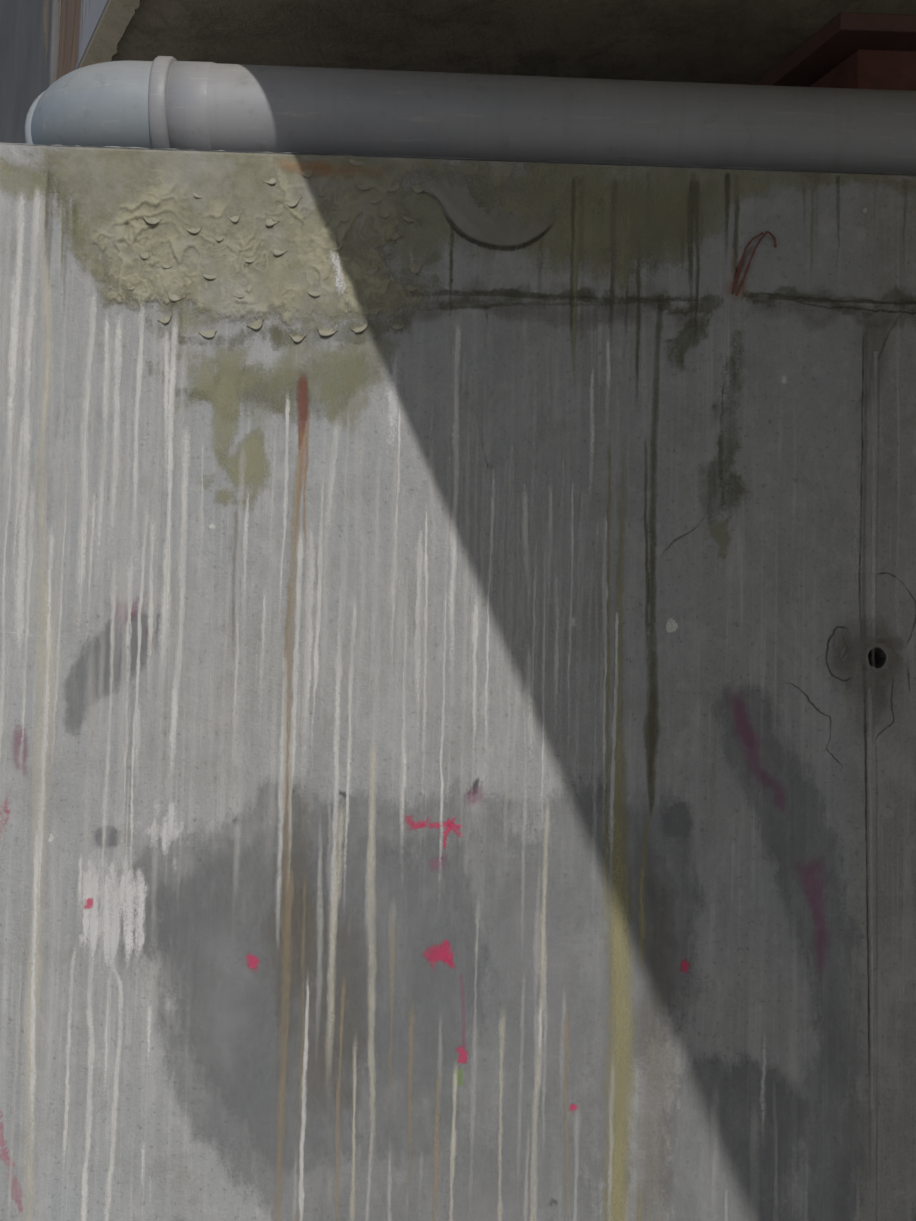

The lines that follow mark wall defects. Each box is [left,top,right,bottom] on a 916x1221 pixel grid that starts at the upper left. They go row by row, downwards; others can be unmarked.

flaking render [38,147,542,342]
water stain [532,163,794,374]
rust [292,379,308,555]
water stain [589,341,611,489]
water stain [385,354,428,827]
water stain [522,484,574,787]
crack [789,683,840,764]
water stain [602,447,658,1221]
water stain [299,987,309,1221]